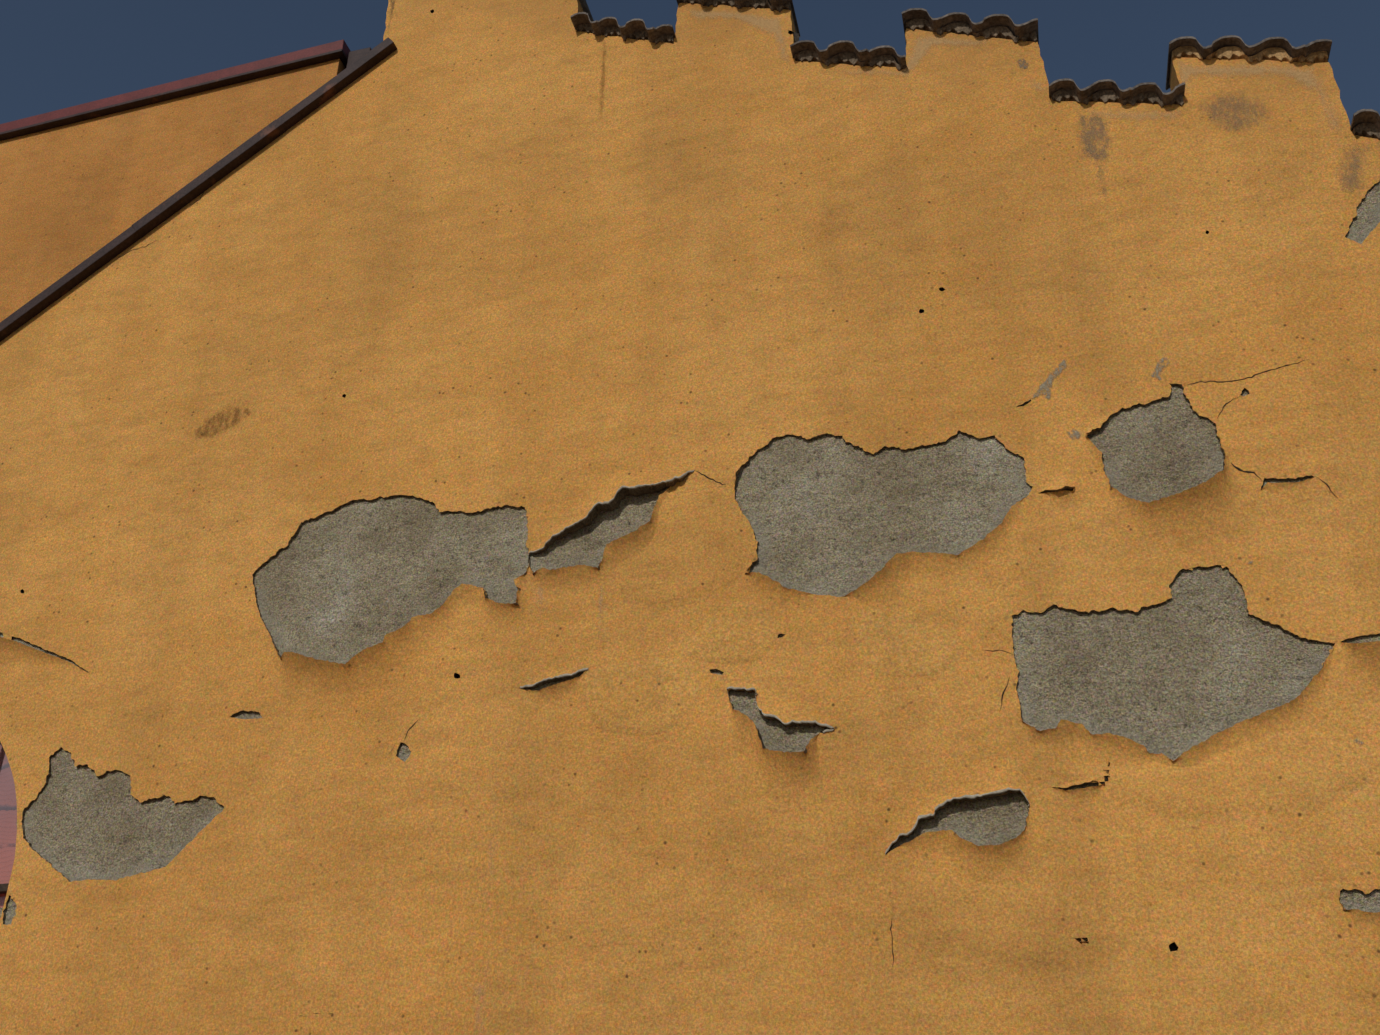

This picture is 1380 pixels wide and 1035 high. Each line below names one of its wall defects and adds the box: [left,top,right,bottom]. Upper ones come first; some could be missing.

spalling [1345,180,1380,244]
crack [1192,359,1309,415]
spalling [252,462,694,710]
spalling [726,431,1033,608]
spalling [1010,358,1344,780]
crack [1231,463,1335,497]
crack [0,632,89,674]
spalling [721,675,840,817]
spalling [16,747,224,882]
spalling [884,766,1035,884]
spalling [1339,889,1380,939]